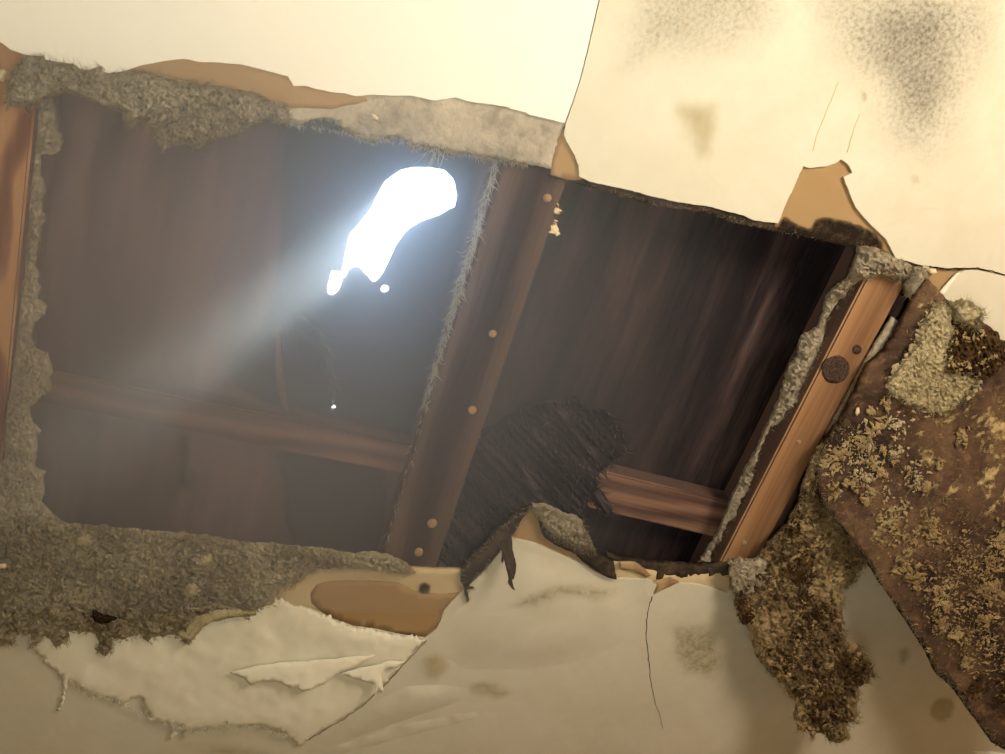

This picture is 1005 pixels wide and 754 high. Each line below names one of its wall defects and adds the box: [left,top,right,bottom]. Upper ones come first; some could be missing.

peeling [129,59,367,109]
peeling [550,129,582,180]
peeling [549,203,562,236]
peeling [775,160,894,257]
crack [929,266,1005,276]
peeling [511,510,591,568]
peeling [276,566,464,637]
peeling [230,654,405,698]
crack [646,596,663,728]